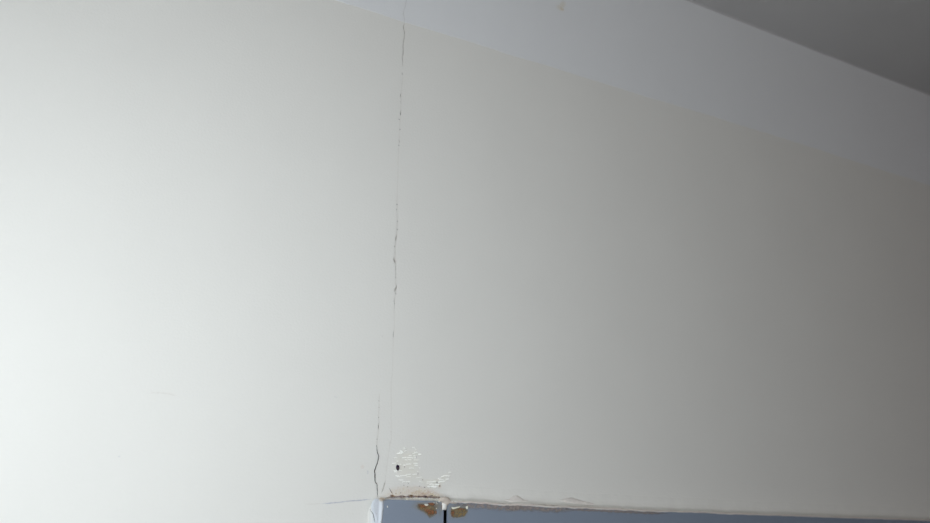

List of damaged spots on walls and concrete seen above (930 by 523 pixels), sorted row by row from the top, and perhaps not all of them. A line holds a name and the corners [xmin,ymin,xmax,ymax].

corrosion [406,498,440,516]
corrosion [451,506,468,517]